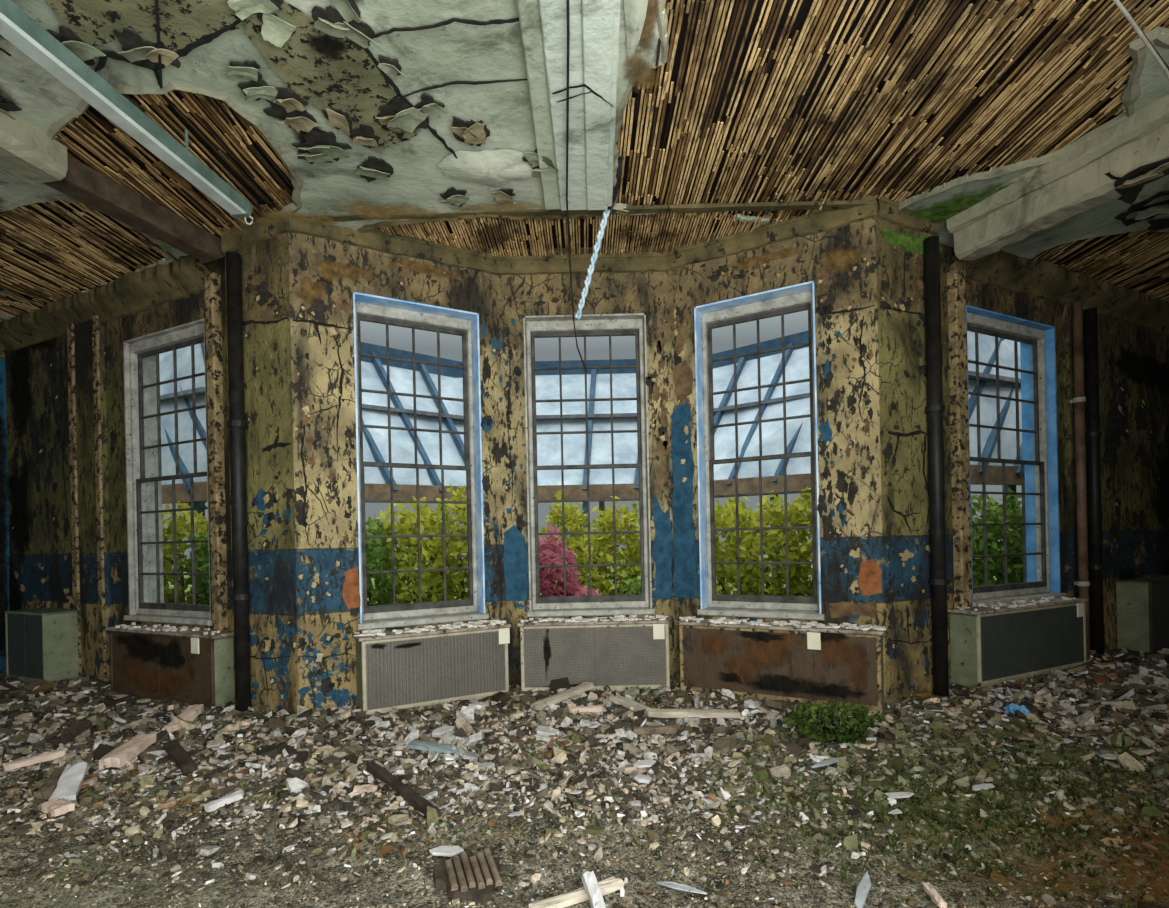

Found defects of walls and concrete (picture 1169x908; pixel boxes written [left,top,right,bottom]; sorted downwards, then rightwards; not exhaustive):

peeling [227,0,296,47]
flaking render [47,60,490,248]
peeling [312,0,406,78]
crack [363,17,527,159]
crack [552,84,613,107]
flaking render [357,0,1169,257]
flaking render [0,194,178,320]
leakage [0,337,61,657]
peeling [646,307,697,599]
peeling [800,246,926,543]
rust [729,634,791,682]
rust [822,638,867,690]